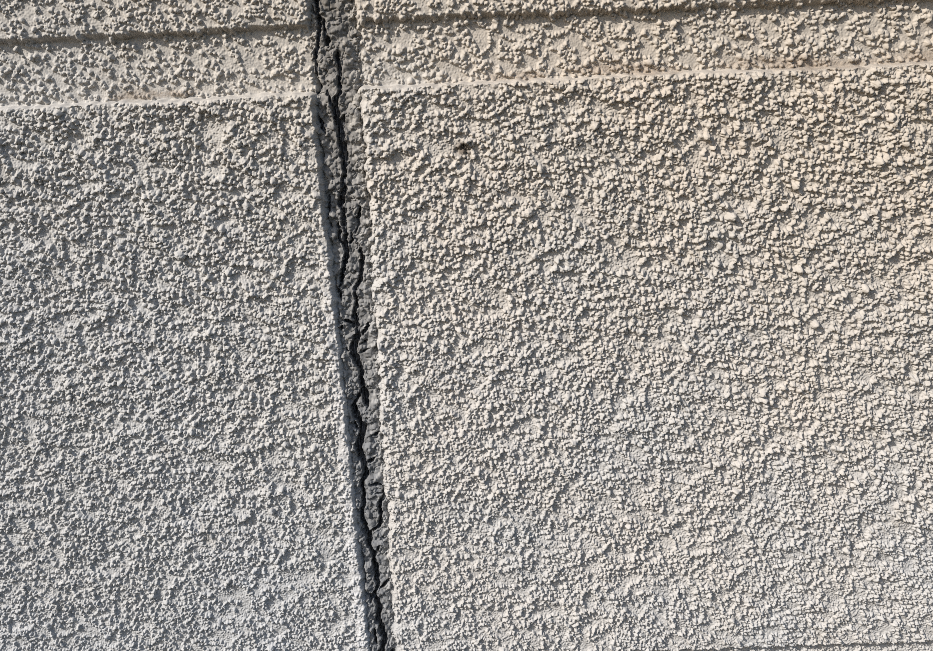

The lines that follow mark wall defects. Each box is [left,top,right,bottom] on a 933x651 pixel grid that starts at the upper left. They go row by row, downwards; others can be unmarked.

crack [313,0,394,651]